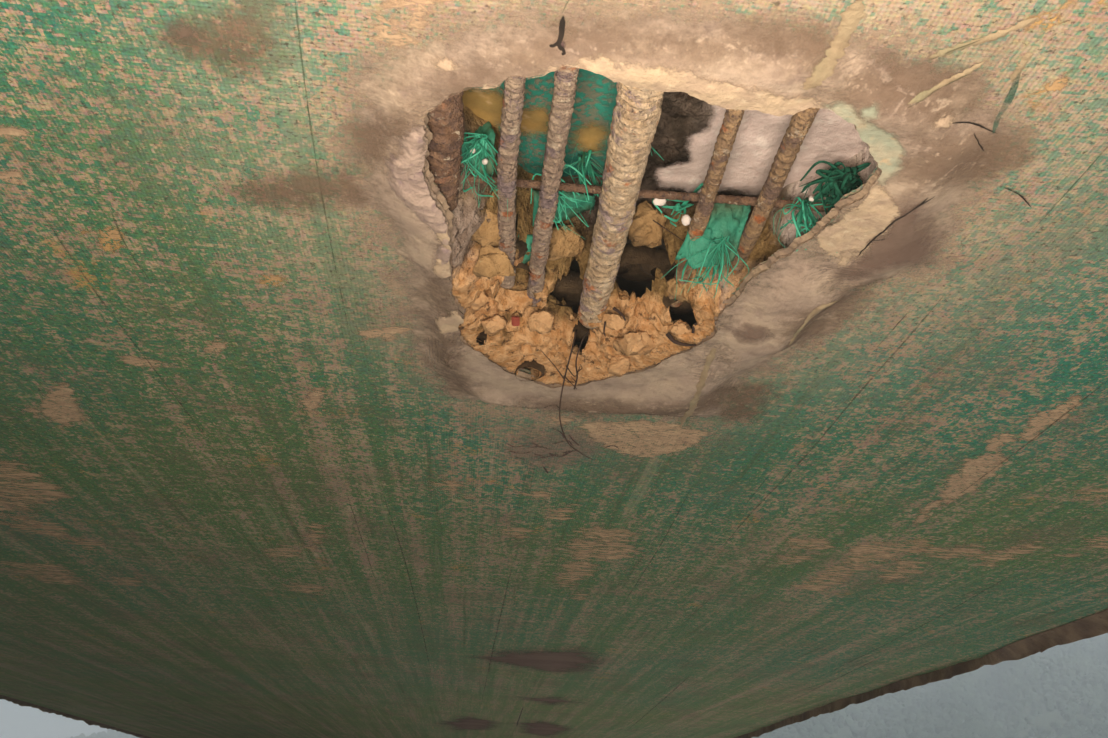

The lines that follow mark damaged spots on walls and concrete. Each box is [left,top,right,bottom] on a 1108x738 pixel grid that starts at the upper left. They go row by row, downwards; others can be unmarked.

damp [850,66,958,122]
damp [906,133,1026,181]
spalling [386,56,905,389]
damp [840,201,932,279]
crack [857,197,934,257]
peeling [358,327,413,341]
damp [791,296,850,345]
damp [481,651,598,673]